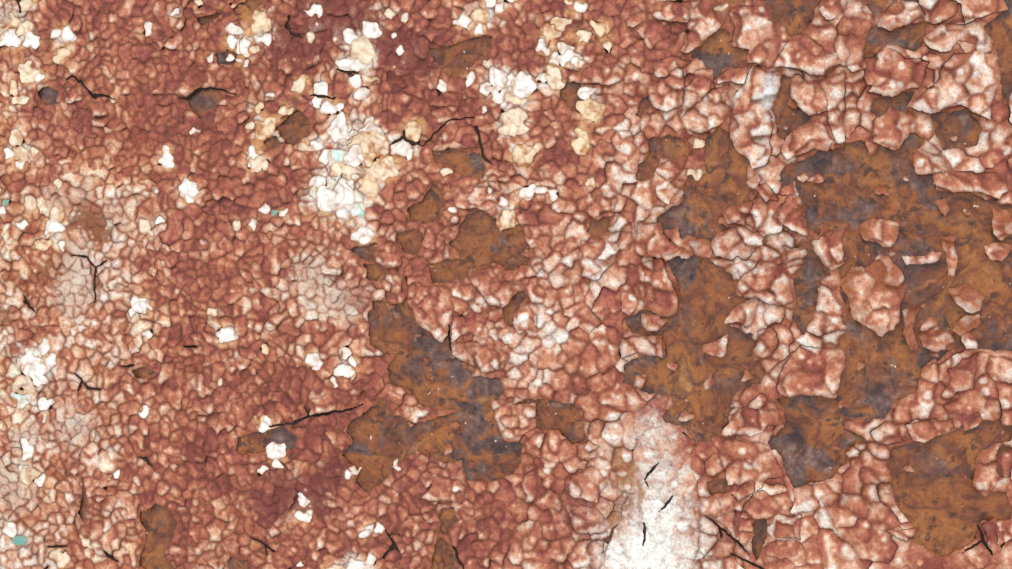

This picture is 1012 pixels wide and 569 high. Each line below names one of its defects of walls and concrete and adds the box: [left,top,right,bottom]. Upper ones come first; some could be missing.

crack [927,3,964,83]
peeling [158,145,174,169]
peeling [178,178,200,203]
crack [773,213,789,231]
peeling [128,295,153,317]
crack [0,0,697,569]
peeling [215,0,1012,569]
peeling [97,330,186,419]
peeling [18,437,267,569]
crack [692,511,764,569]
crack [788,484,880,569]
crack [963,525,1004,569]